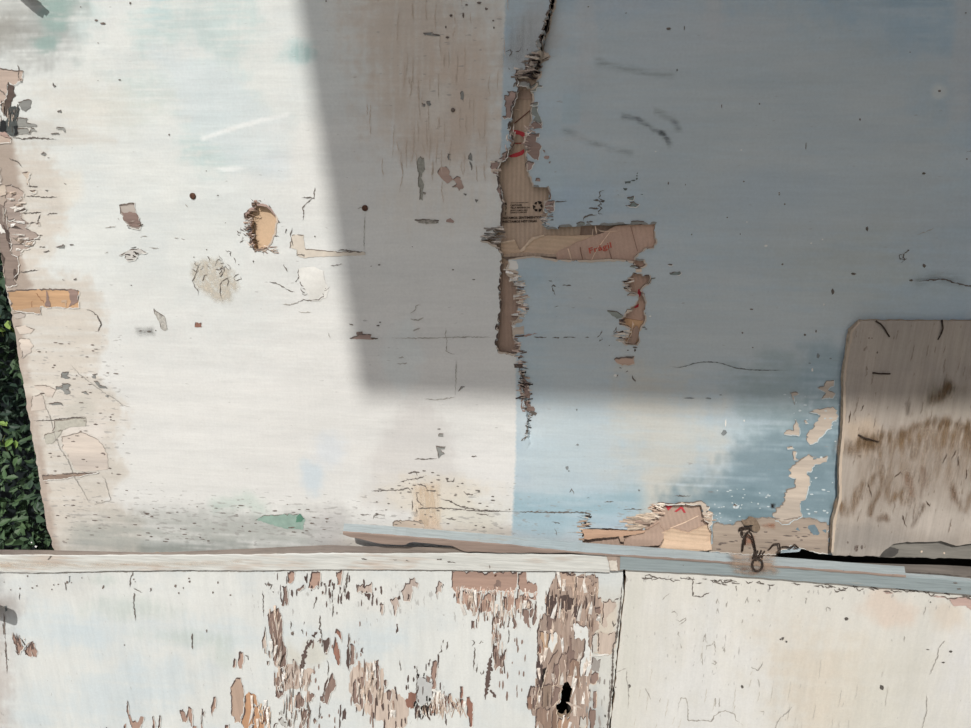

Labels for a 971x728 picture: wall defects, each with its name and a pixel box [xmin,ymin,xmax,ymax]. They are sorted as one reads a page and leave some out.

peeling [0,99,37,138]
peeling [623,173,643,208]
peeling [5,171,48,251]
peeling [506,271,528,316]
peeling [13,312,34,359]
peeling [614,347,637,368]
peeling [772,380,839,525]
peeling [233,651,244,670]
peeling [431,570,601,728]
peeling [124,701,161,728]
peeling [179,697,217,728]